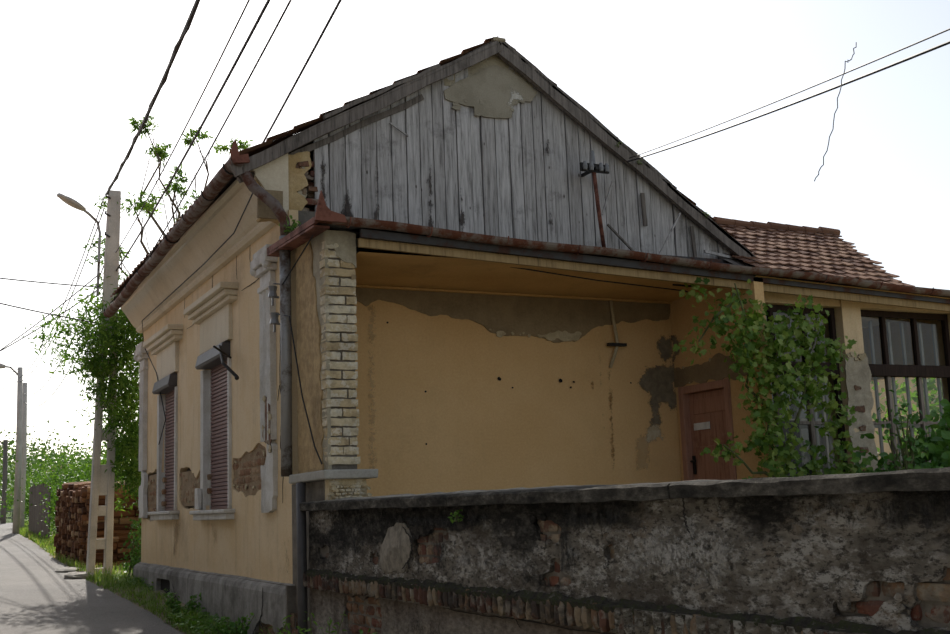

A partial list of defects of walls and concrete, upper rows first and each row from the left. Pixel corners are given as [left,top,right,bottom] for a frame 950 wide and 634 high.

peeling [443,65,537,119]
spalling [288,152,318,212]
peeling [354,288,670,343]
peeling [674,353,748,387]
spalling [845,351,878,471]
flaking render [233,395,272,496]
flaking render [147,474,167,516]
flaking render [180,471,212,507]
flaking render [829,561,950,631]